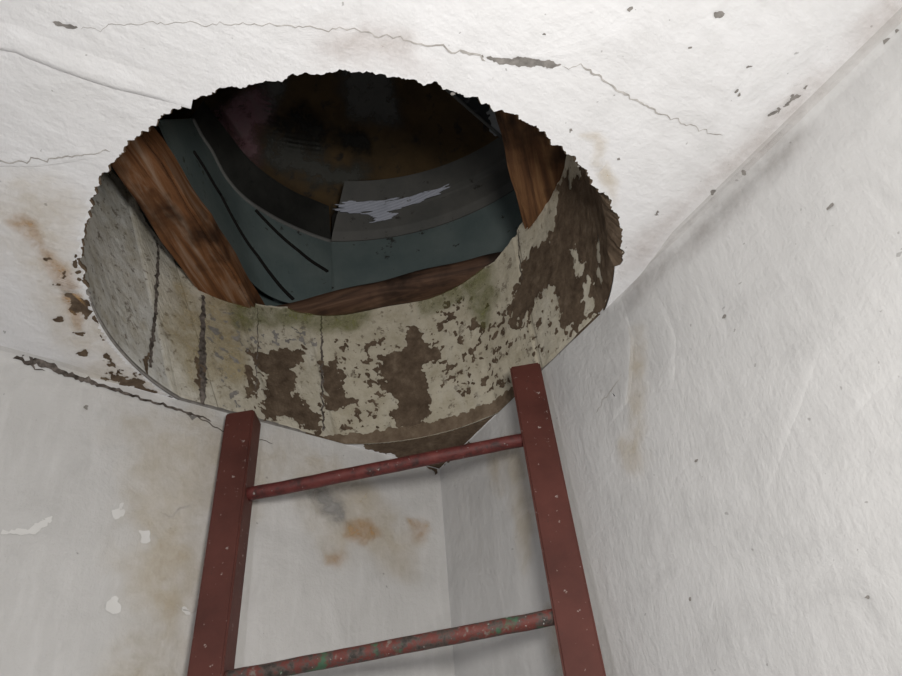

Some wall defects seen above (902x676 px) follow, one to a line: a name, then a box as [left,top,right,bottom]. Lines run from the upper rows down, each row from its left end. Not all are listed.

crack [80,21,485,61]
crack [563,63,721,135]
crack [0,149,108,164]
peeling [52,254,105,341]
peeling [100,353,157,393]